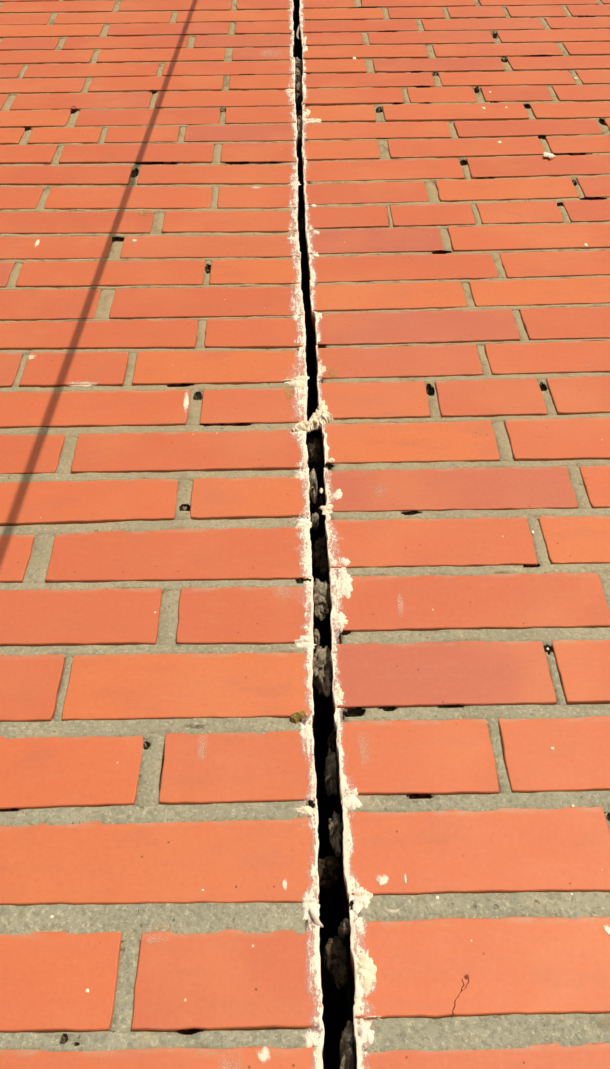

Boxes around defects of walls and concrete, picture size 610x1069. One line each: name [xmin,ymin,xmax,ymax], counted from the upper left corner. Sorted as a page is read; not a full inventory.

crack [293,0,357,1069]